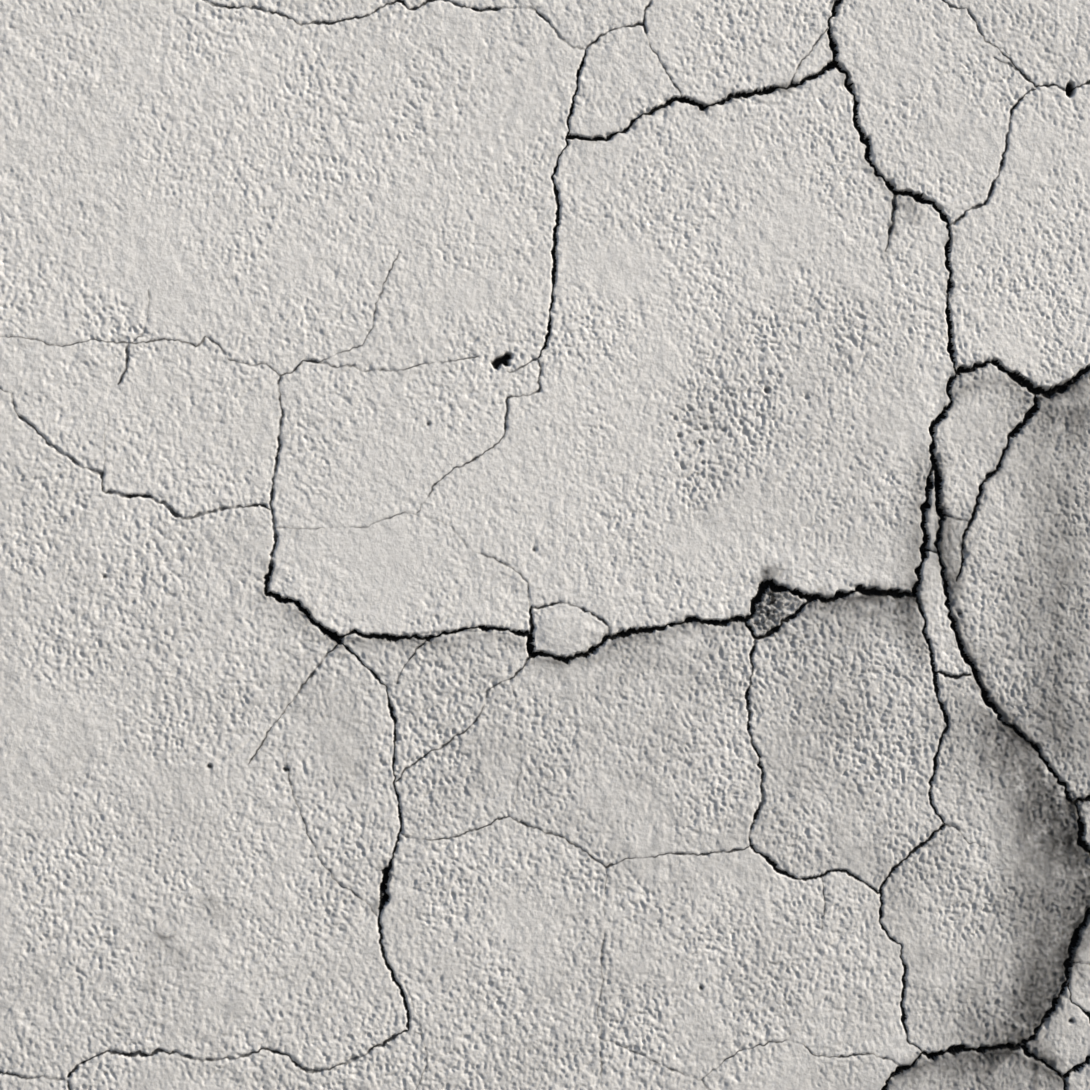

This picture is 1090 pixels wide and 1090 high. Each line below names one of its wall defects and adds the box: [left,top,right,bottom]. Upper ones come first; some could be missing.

crack [8,336,235,385]
crack [13,403,199,519]
crack [237,0,1090,1090]
spalling [751,591,797,632]
crack [67,1049,193,1090]
crack [207,1048,358,1073]